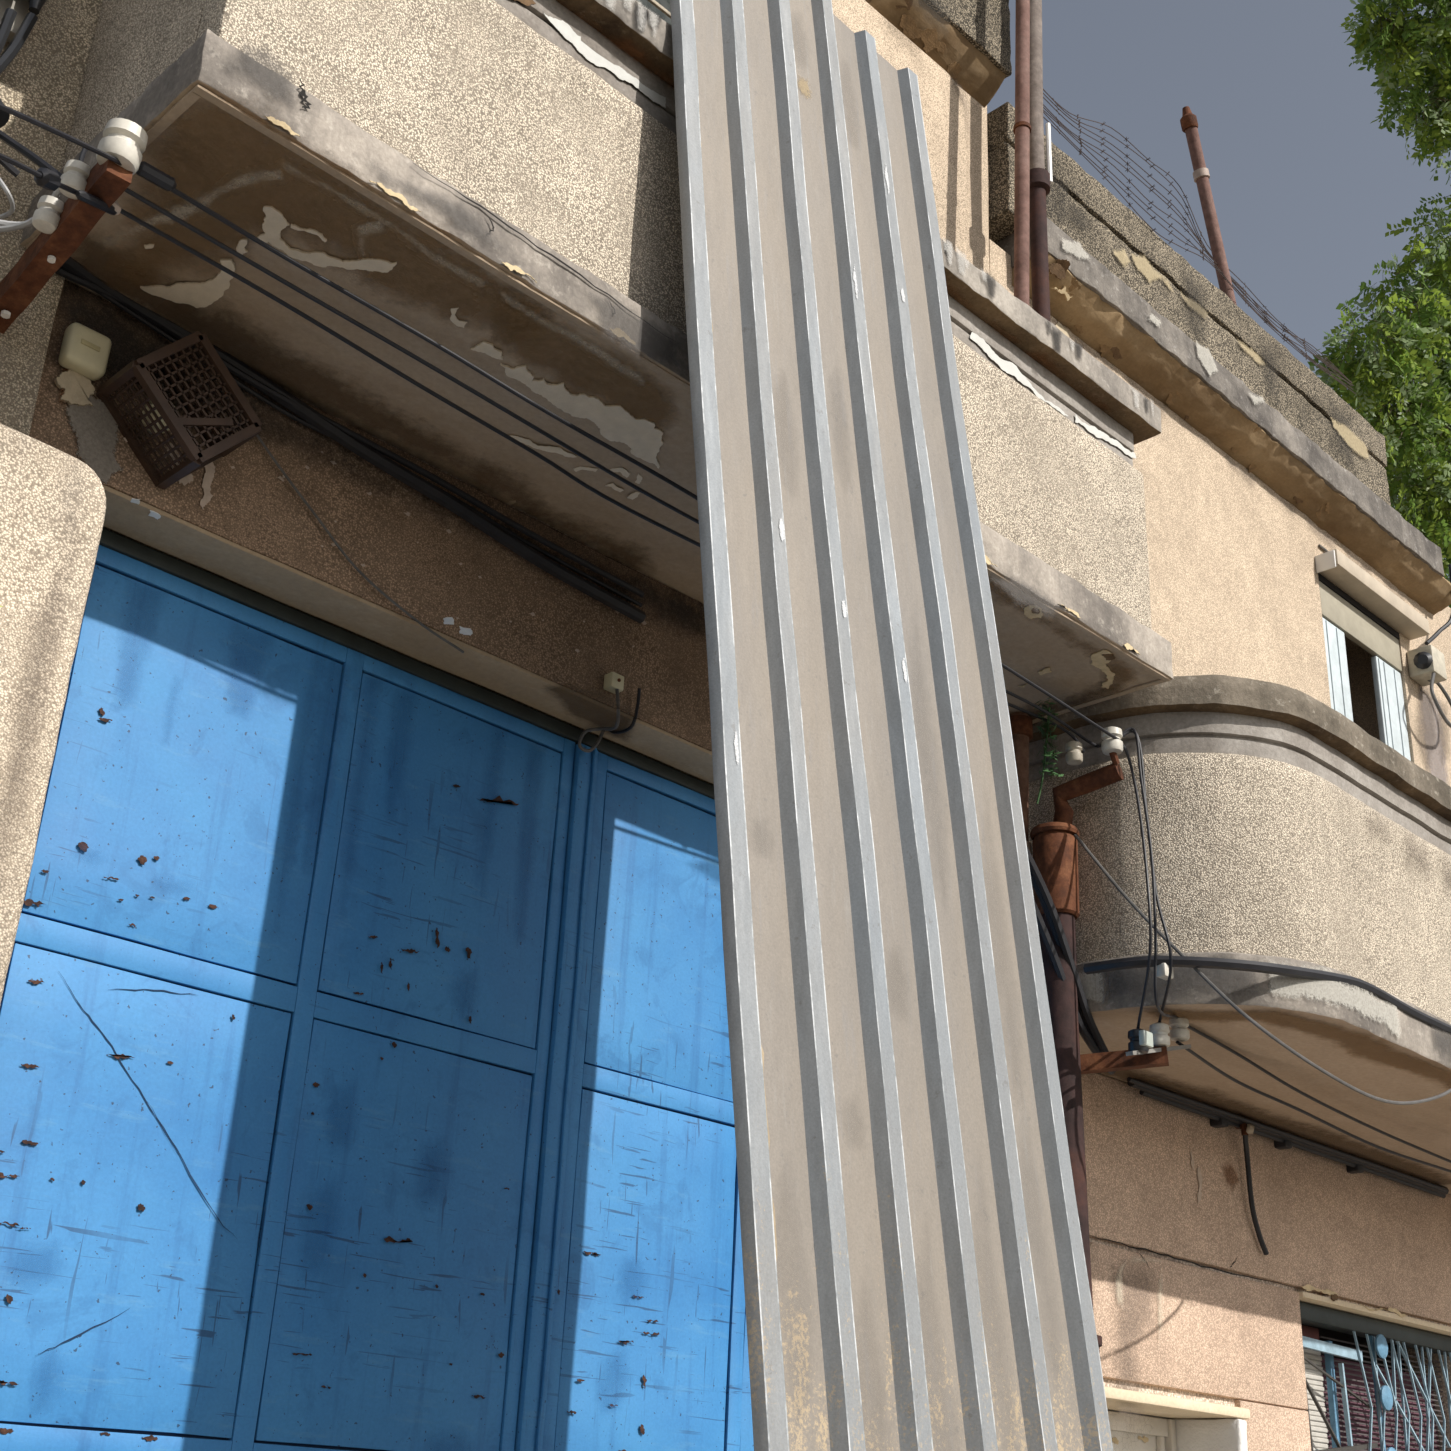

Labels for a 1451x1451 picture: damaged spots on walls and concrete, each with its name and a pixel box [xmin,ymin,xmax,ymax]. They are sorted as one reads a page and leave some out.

water stain [239,47,292,96]
spalling [265,116,300,137]
spalling [369,180,421,212]
peeling [140,206,397,308]
spalling [502,262,537,283]
peeling [450,308,467,328]
water stain [63,104,704,633]
water stain [989,581,1055,612]
spalling [1024,604,1080,619]
spalling [1091,643,1140,689]